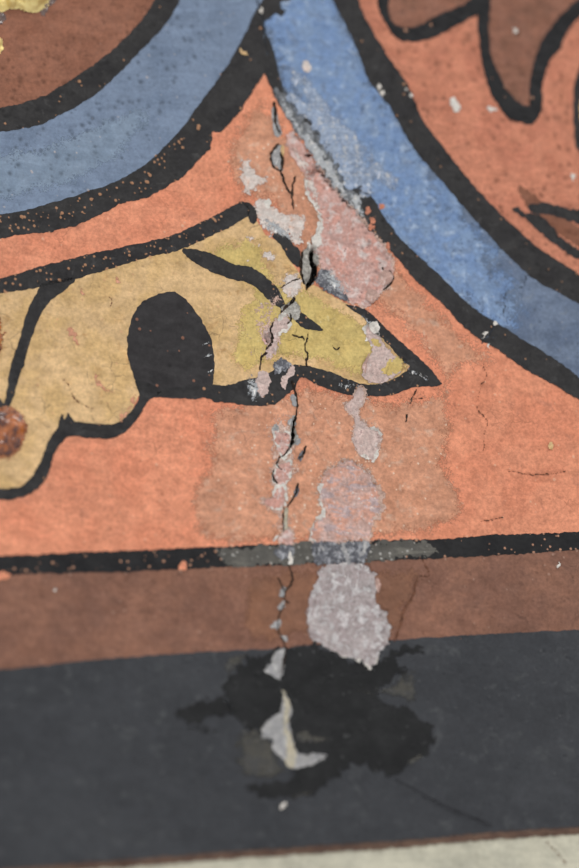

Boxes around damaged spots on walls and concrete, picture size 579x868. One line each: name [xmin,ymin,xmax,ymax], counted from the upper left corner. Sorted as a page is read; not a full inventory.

crack [270,101,296,209]
peeling [285,131,397,309]
peeling [260,301,301,360]
crack [259,246,320,532]
peeling [259,418,304,511]
peeling [273,527,297,565]
peeling [305,321,406,670]
peeling [264,586,288,679]
crack [277,565,294,673]
peeling [261,690,327,769]
leakage [176,640,437,800]